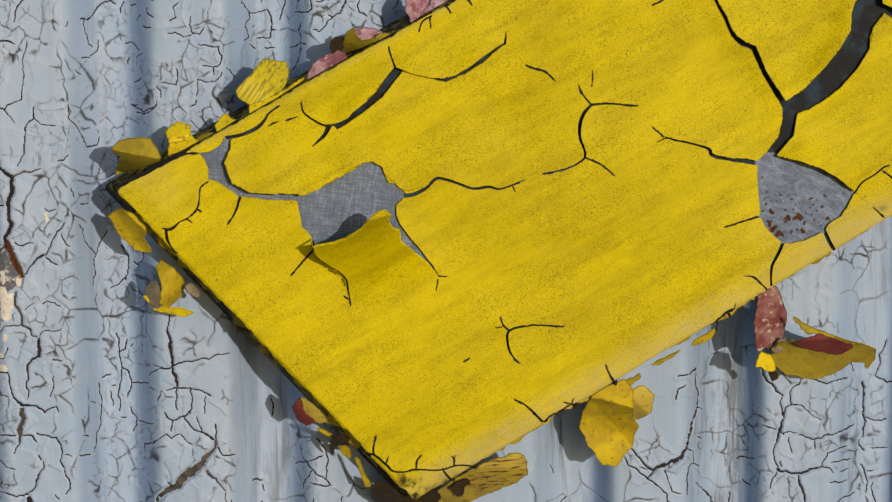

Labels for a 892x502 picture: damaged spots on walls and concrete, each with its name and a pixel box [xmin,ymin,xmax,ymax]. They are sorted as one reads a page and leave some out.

crack [226,46,405,147]
crack [432,32,506,81]
crack [404,70,638,198]
crack [652,0,892,165]
peeling [0,249,22,322]
rust [4,242,24,281]
crack [0,0,235,502]
peeling [111,113,439,276]
rust [762,191,830,237]
peeling [755,152,855,244]
crack [362,436,478,481]
crack [624,339,892,502]